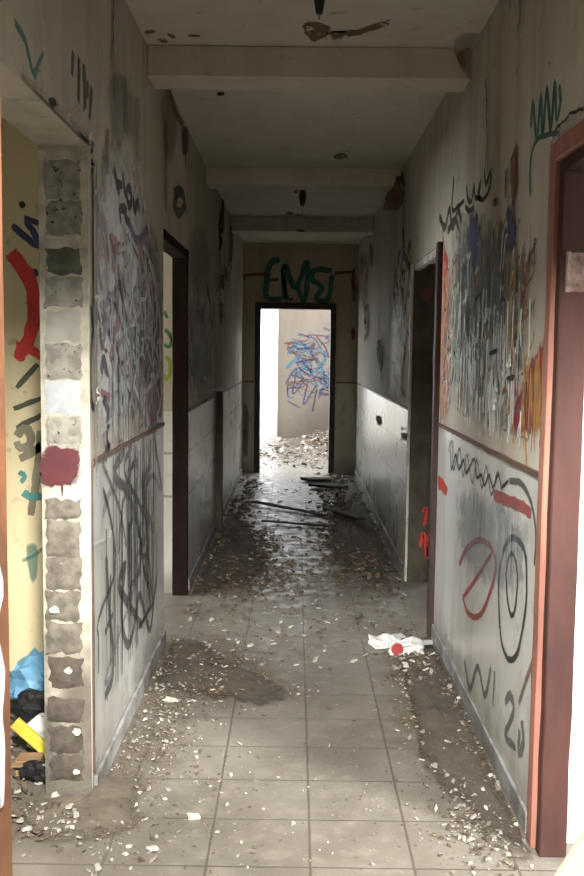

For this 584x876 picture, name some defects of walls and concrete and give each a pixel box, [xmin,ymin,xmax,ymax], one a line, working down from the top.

flaking render [23,66,95,798]